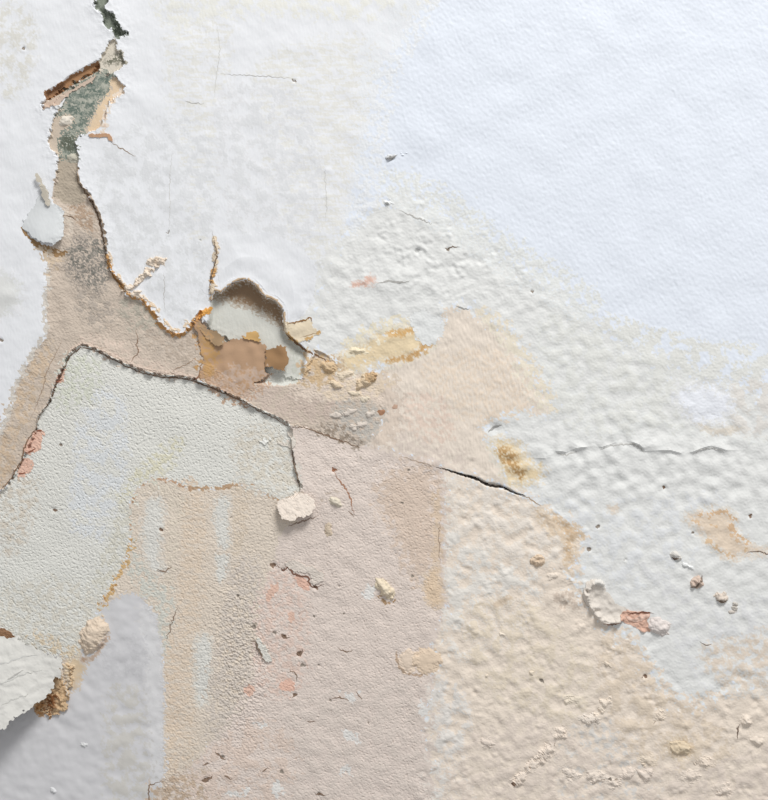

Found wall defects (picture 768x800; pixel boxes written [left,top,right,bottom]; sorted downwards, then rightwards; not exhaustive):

leakage [53,49,128,163]
crack [0,330,360,492]
spalling [0,38,452,800]
crack [334,472,355,517]
crack [401,456,539,505]